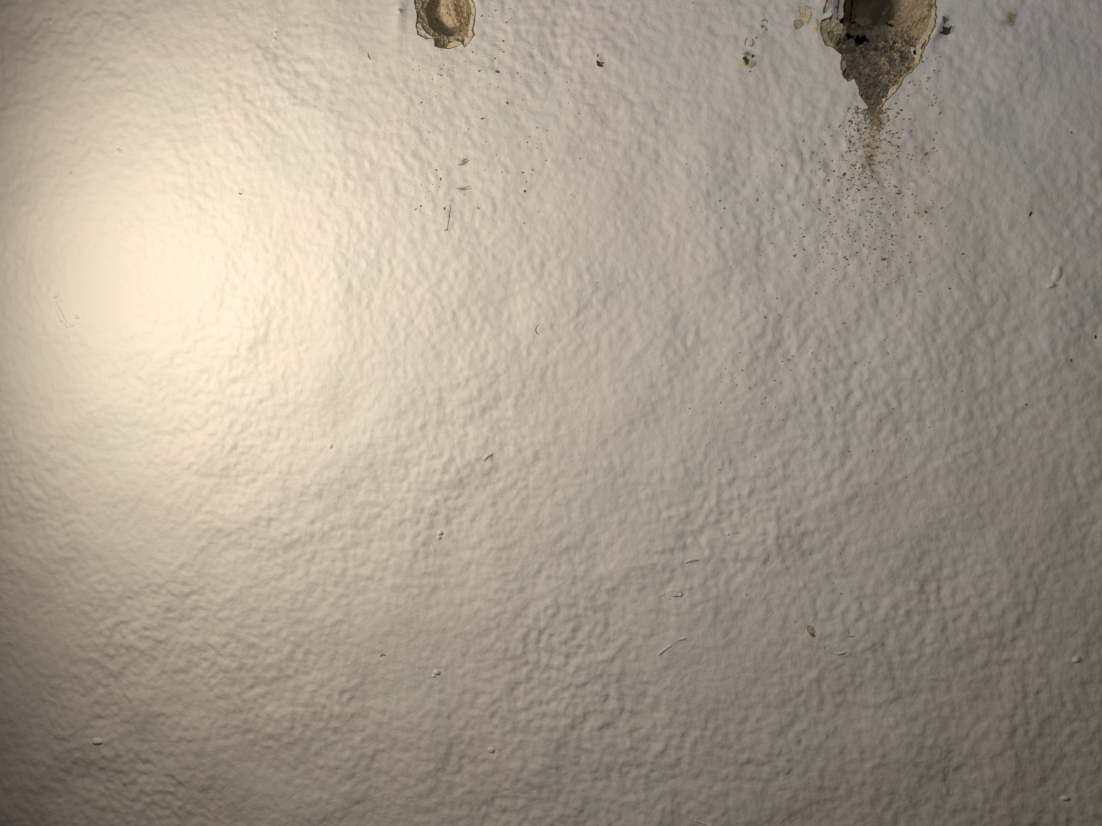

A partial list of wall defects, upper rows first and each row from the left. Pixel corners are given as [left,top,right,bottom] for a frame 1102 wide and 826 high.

spalling [414,0,476,49]
spalling [793,0,937,117]